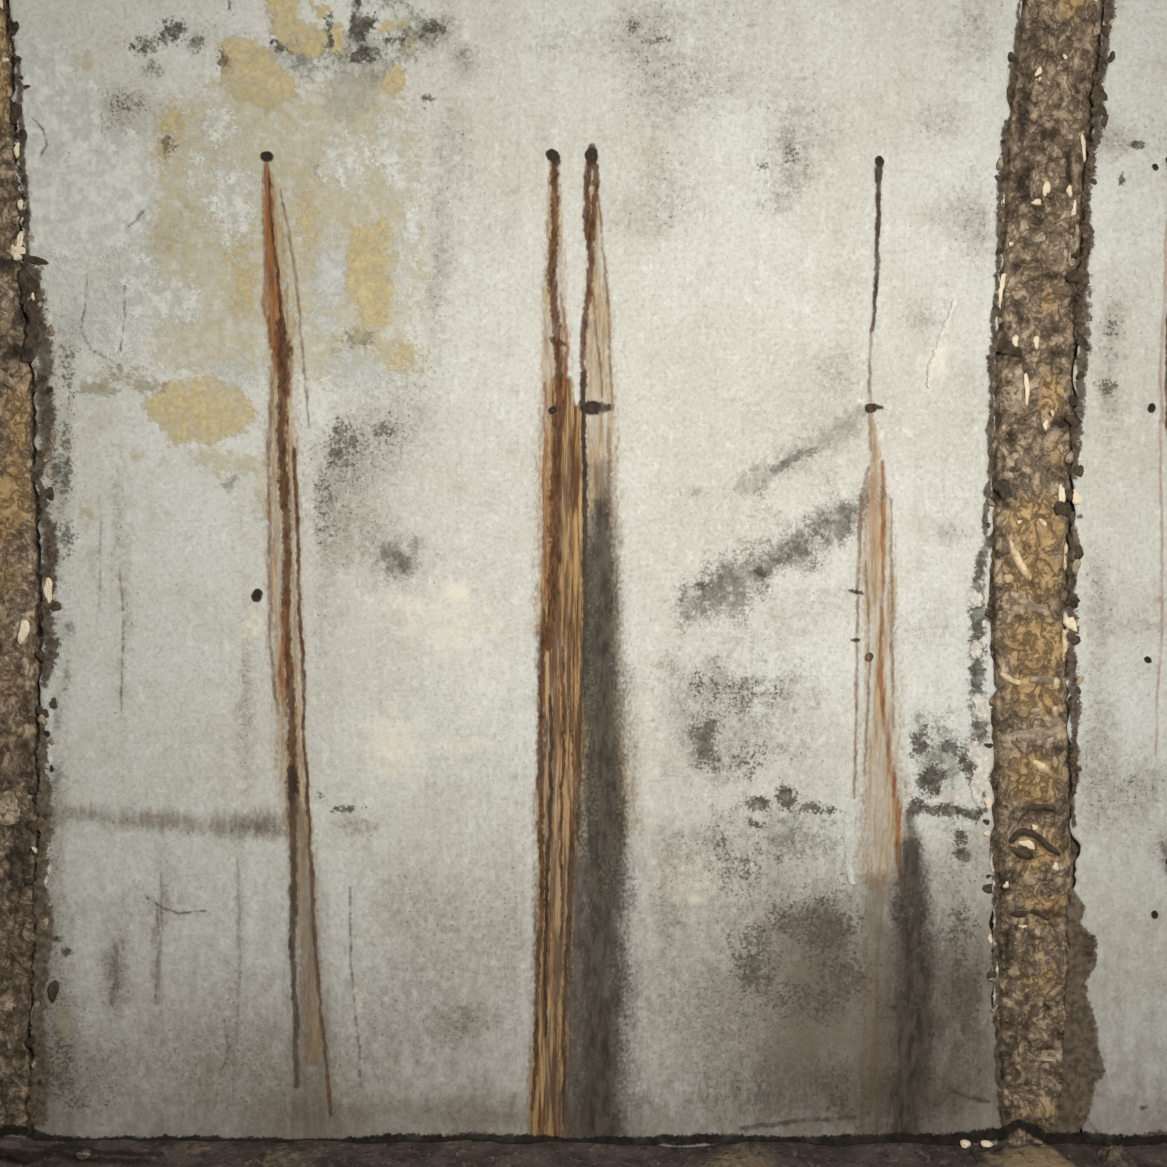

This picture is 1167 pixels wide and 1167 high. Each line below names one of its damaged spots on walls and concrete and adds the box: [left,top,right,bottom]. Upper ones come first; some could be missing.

peeling [0,0,446,1126]
rust [262,162,333,1116]
rust [527,144,638,1139]
water stain [564,484,634,1139]
water stain [683,659,796,781]
water stain [690,783,836,900]
water stain [727,724,990,1135]
rust [842,424,908,891]
rust [870,160,883,337]
peeling [966,119,1019,813]
peeling [1018,824,1038,850]
spalling [1056,886,1106,1134]